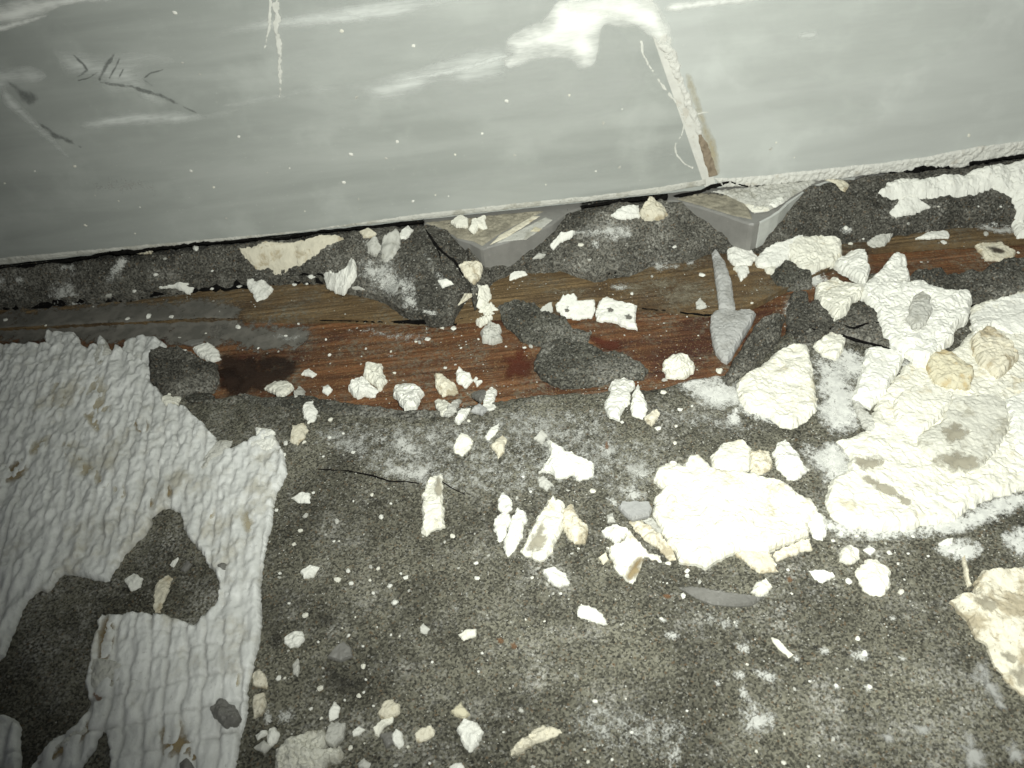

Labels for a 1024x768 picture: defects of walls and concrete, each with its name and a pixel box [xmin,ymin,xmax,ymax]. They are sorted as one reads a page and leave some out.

flaking render [889,195,930,218]
flaking render [451,215,487,234]
flaking render [533,230,575,259]
flaking render [867,233,893,248]
flaking render [915,230,950,240]
flaking render [193,342,221,362]
flaking render [813,332,846,361]
water stain [219,354,296,396]
crack [318,469,465,495]
flaking render [124,557,192,614]
flaking render [252,669,272,754]
peeling [0,715,22,768]